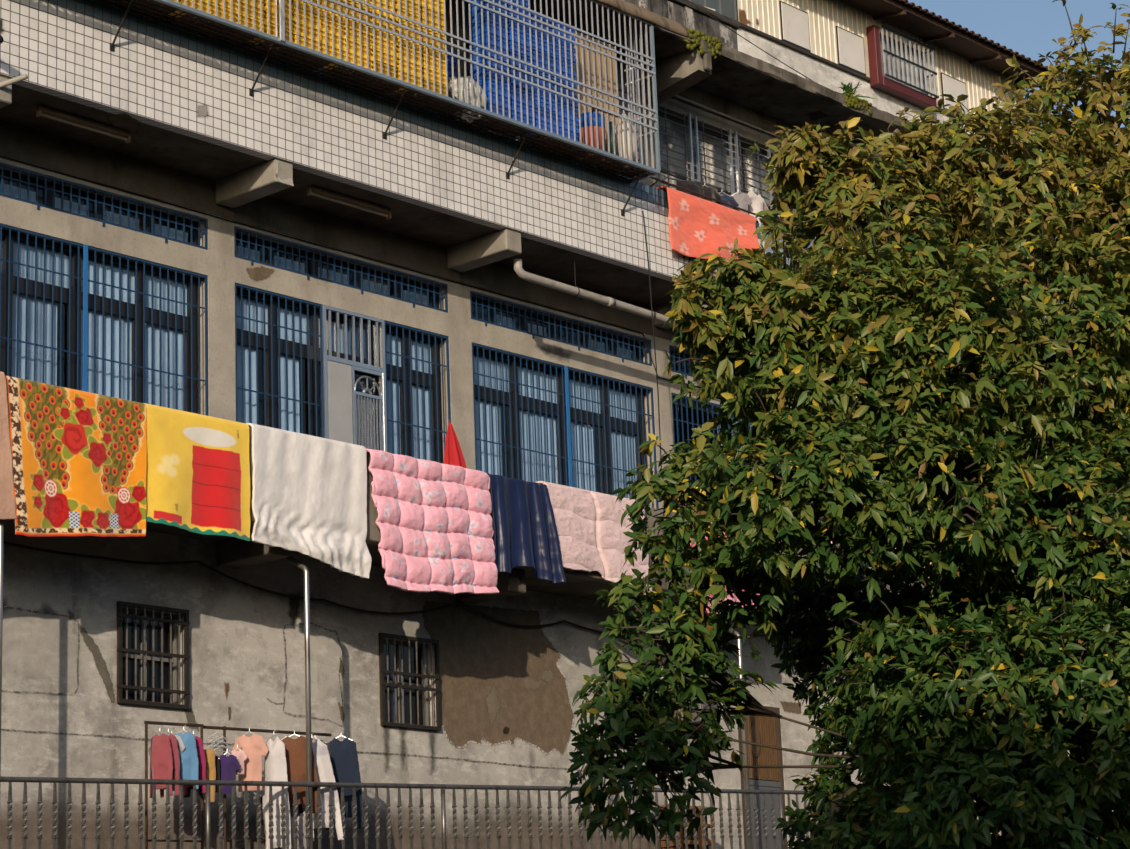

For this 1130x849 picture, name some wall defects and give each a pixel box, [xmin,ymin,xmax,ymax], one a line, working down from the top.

crack [2,606,80,695]
crack [268,623,345,726]
peeling [422,601,575,755]
crack [1,729,150,755]
crack [357,751,583,772]